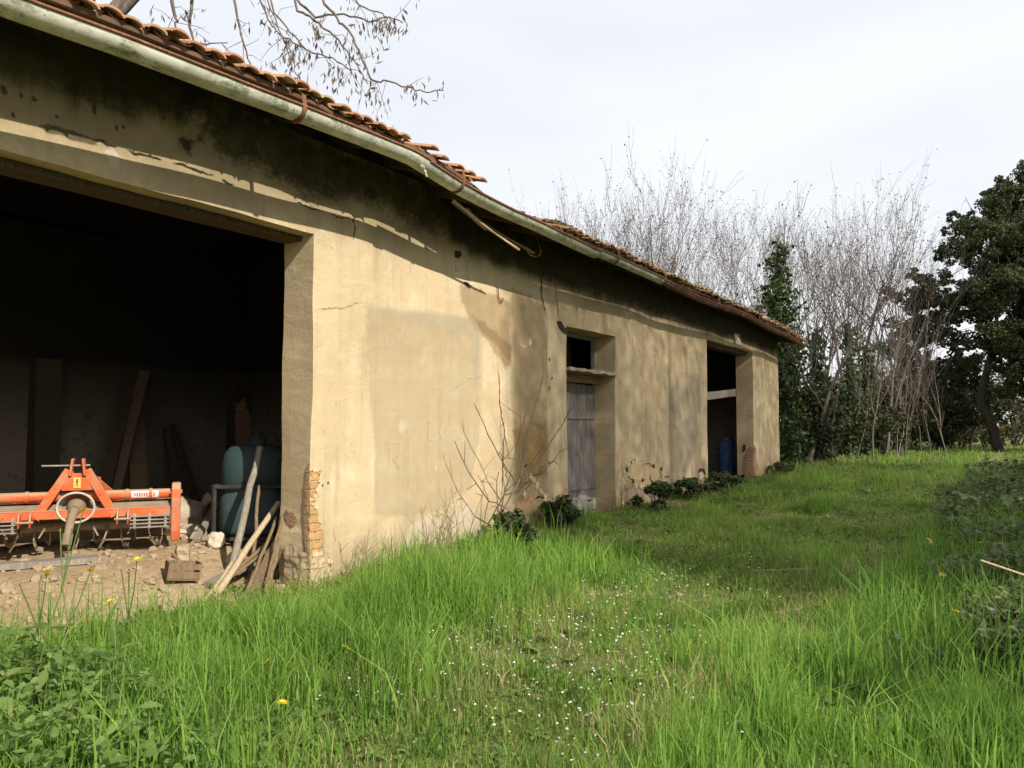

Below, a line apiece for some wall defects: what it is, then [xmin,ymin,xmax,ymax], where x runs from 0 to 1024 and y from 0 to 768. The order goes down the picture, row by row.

leakage [0,16,778,352]
spalling [283,464,333,592]
leakage [512,292,547,498]
peeling [622,457,672,508]